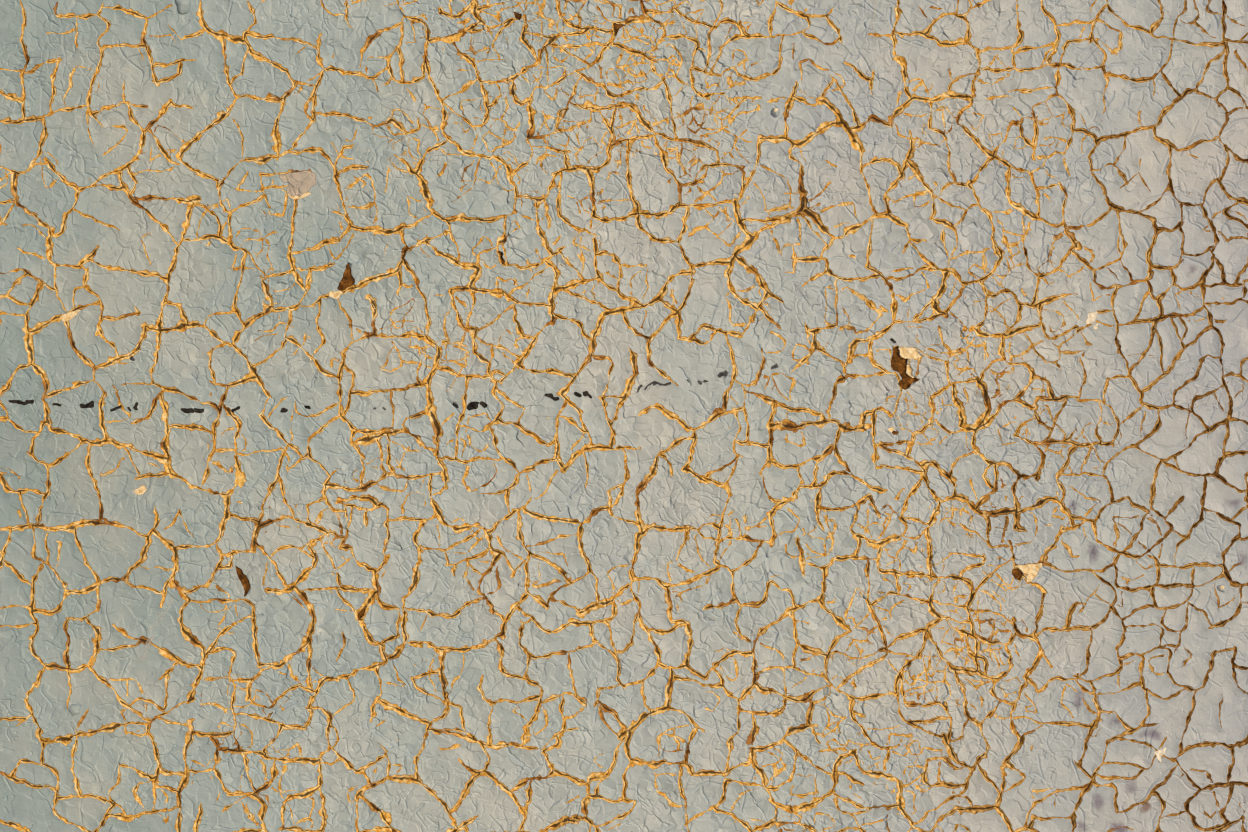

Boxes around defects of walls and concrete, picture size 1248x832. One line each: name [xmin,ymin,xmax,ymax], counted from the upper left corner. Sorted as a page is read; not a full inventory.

crack [321,0,366,28]
crack [594,0,622,20]
crack [799,59,829,80]
crack [844,61,875,95]
crack [1234,50,1248,71]
crack [236,228,277,258]
crack [1046,233,1063,267]
spalling [328,263,355,299]
crack [839,287,888,335]
spalling [891,346,921,390]
crack [763,373,796,401]
crack [656,725,692,757]